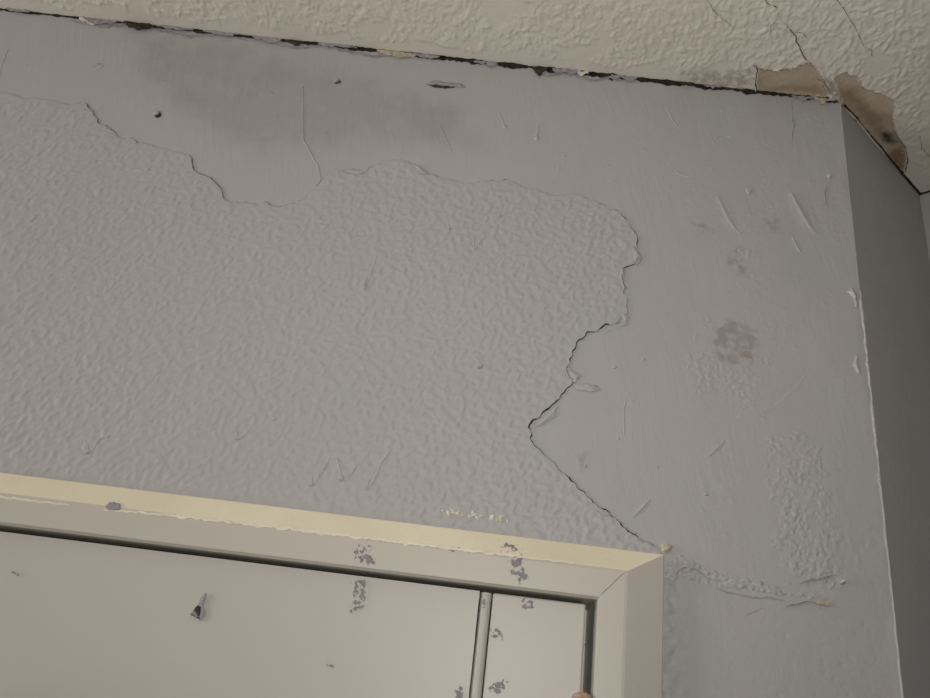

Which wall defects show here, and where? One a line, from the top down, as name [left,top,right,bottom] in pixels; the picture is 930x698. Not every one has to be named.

peeling [186,154,310,208]
crack [0,0,930,195]
peeling [754,63,909,175]
peeling [526,193,657,548]